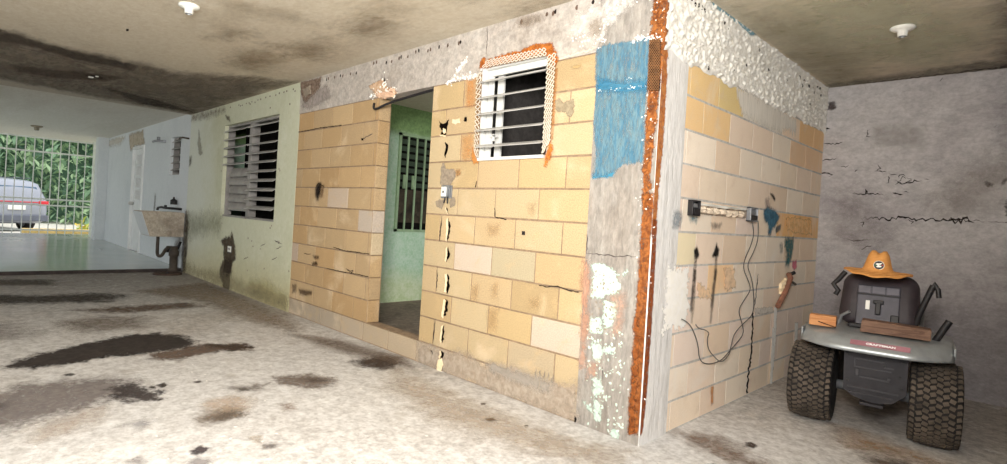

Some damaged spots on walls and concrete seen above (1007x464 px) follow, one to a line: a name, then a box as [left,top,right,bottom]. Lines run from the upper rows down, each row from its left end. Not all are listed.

leakage [18,67,186,111]
rust [468,43,559,166]
peeling [570,0,836,179]
mould [831,63,1002,86]
rust [627,0,669,435]
crack [822,128,1007,227]
crack [430,208,451,371]
rust [579,260,596,376]
peeling [584,263,628,439]